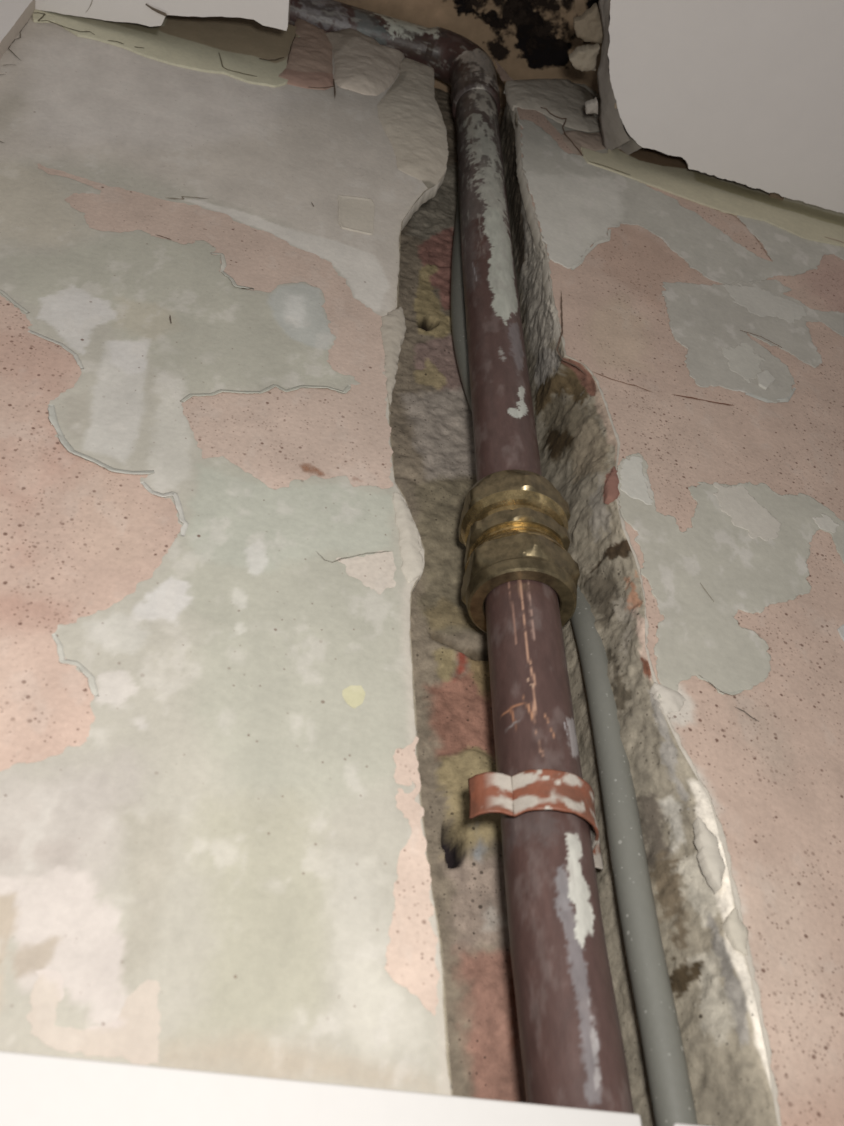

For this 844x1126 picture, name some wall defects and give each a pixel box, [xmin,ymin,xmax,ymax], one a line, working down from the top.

peeling [145,3,169,16]
flaking render [278,18,334,90]
mould [454,0,599,69]
peeling [647,185,772,261]
peeling [37,164,424,595]
peeling [538,221,844,532]
peeling [0,289,189,771]
peeling [385,736,440,1016]
peeling [625,522,844,1126]